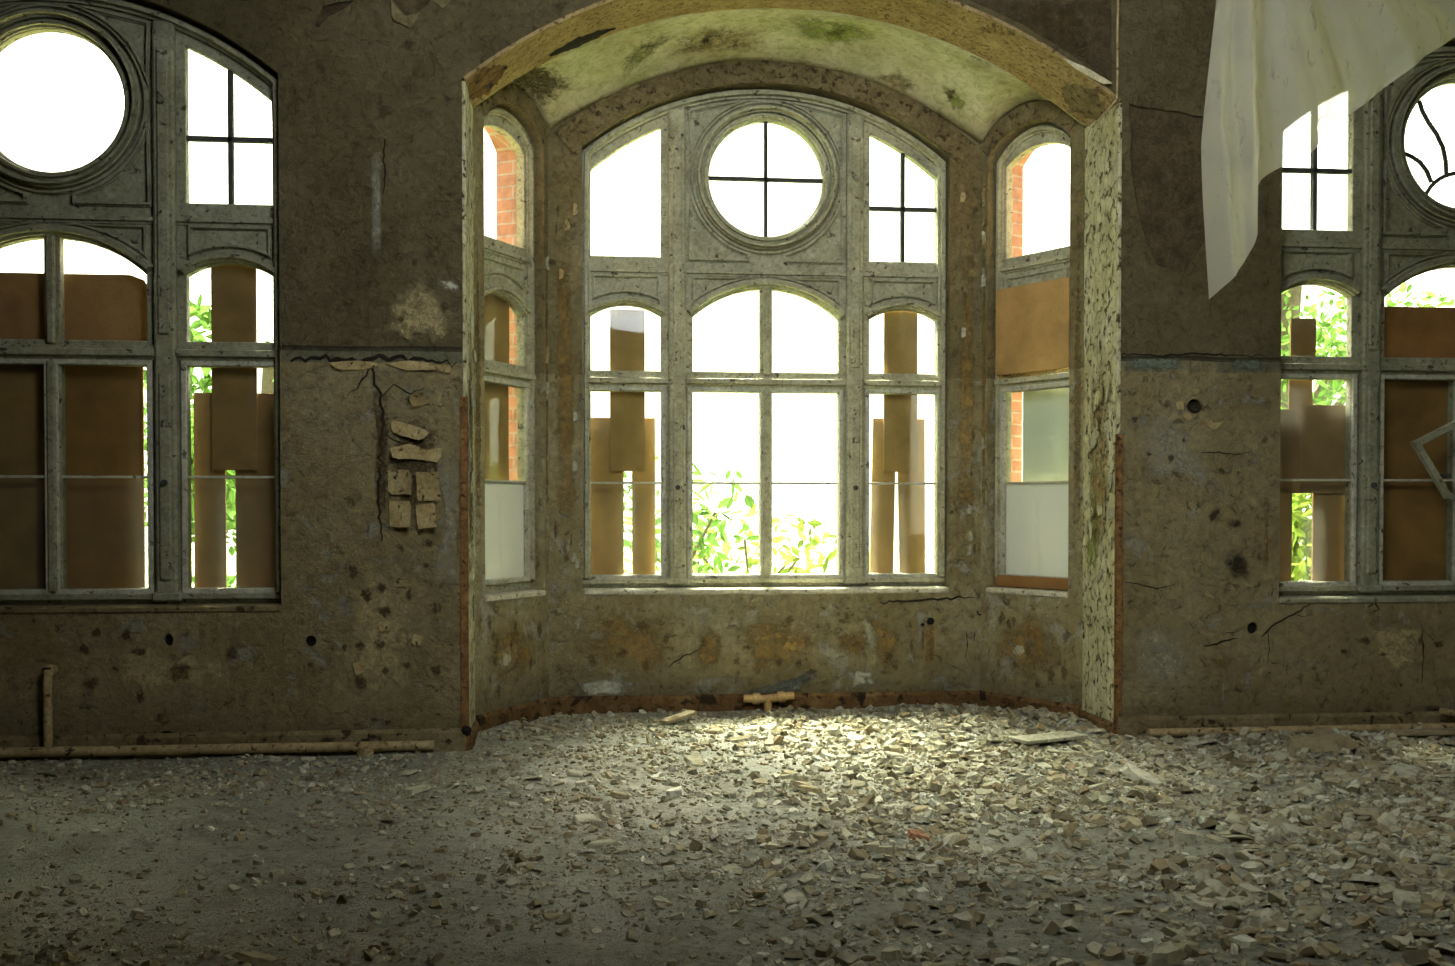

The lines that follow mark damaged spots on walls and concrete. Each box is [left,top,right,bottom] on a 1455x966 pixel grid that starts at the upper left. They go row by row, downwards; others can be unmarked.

water stain [626,37,667,69]
peeling [679,30,757,52]
spalling [969,0,1112,120]
water stain [514,67,569,105]
crack [349,368,432,542]